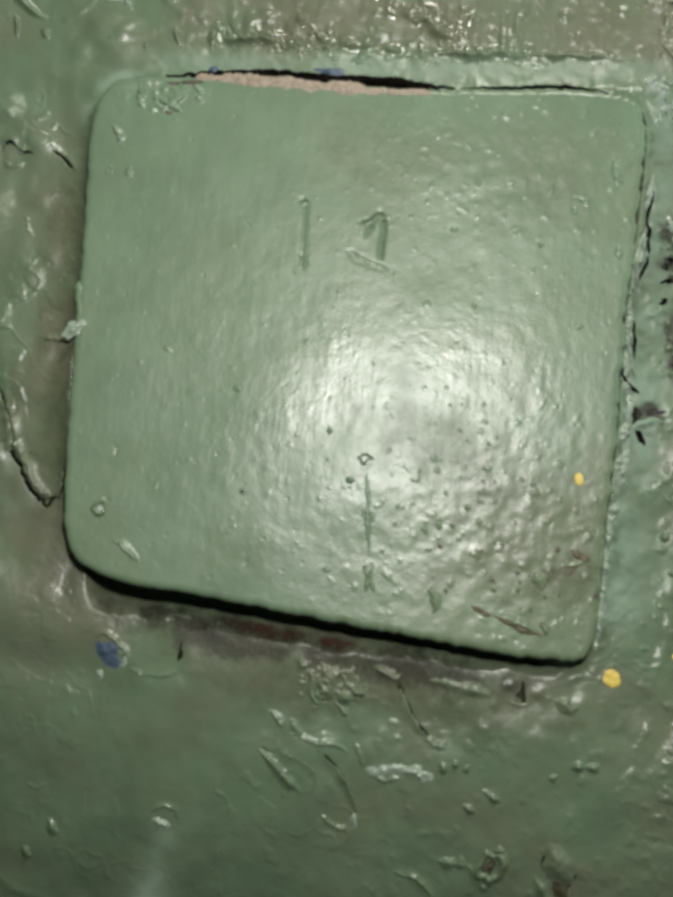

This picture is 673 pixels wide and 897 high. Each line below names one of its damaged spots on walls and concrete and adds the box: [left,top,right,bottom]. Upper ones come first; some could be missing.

spalling [245,8,285,27]
spalling [133,66,432,115]
crack [8,435,66,507]
peeling [554,696,580,717]
peeling [259,709,471,830]
spalling [470,845,510,892]
peeling [532,843,577,897]